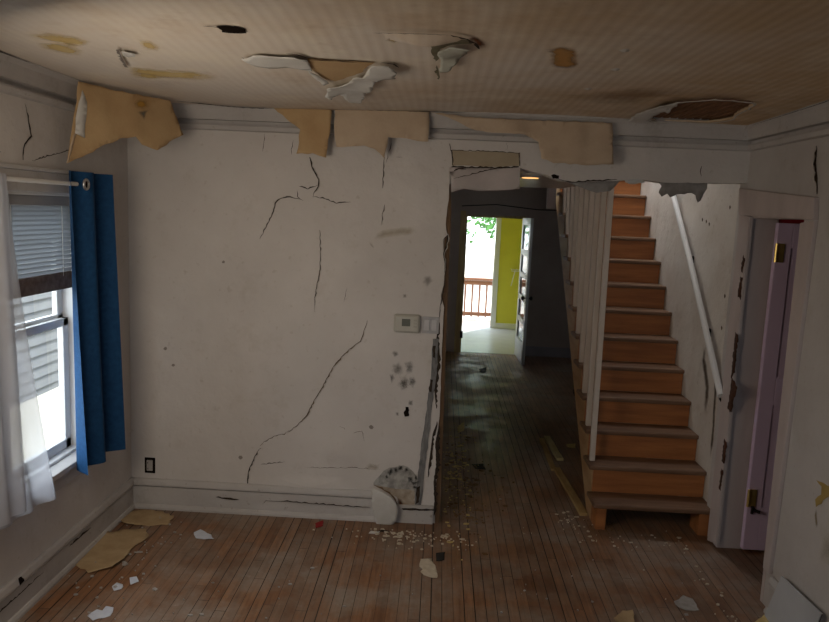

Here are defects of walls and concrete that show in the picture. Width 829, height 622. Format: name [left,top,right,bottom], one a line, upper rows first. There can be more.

peeling [380,29,483,79]
crack [23,103,69,161]
peeling [628,103,678,123]
crack [260,142,346,238]
crack [314,230,322,310]
crack [218,324,367,500]
crack [267,500,370,508]
spalling [369,465,418,534]